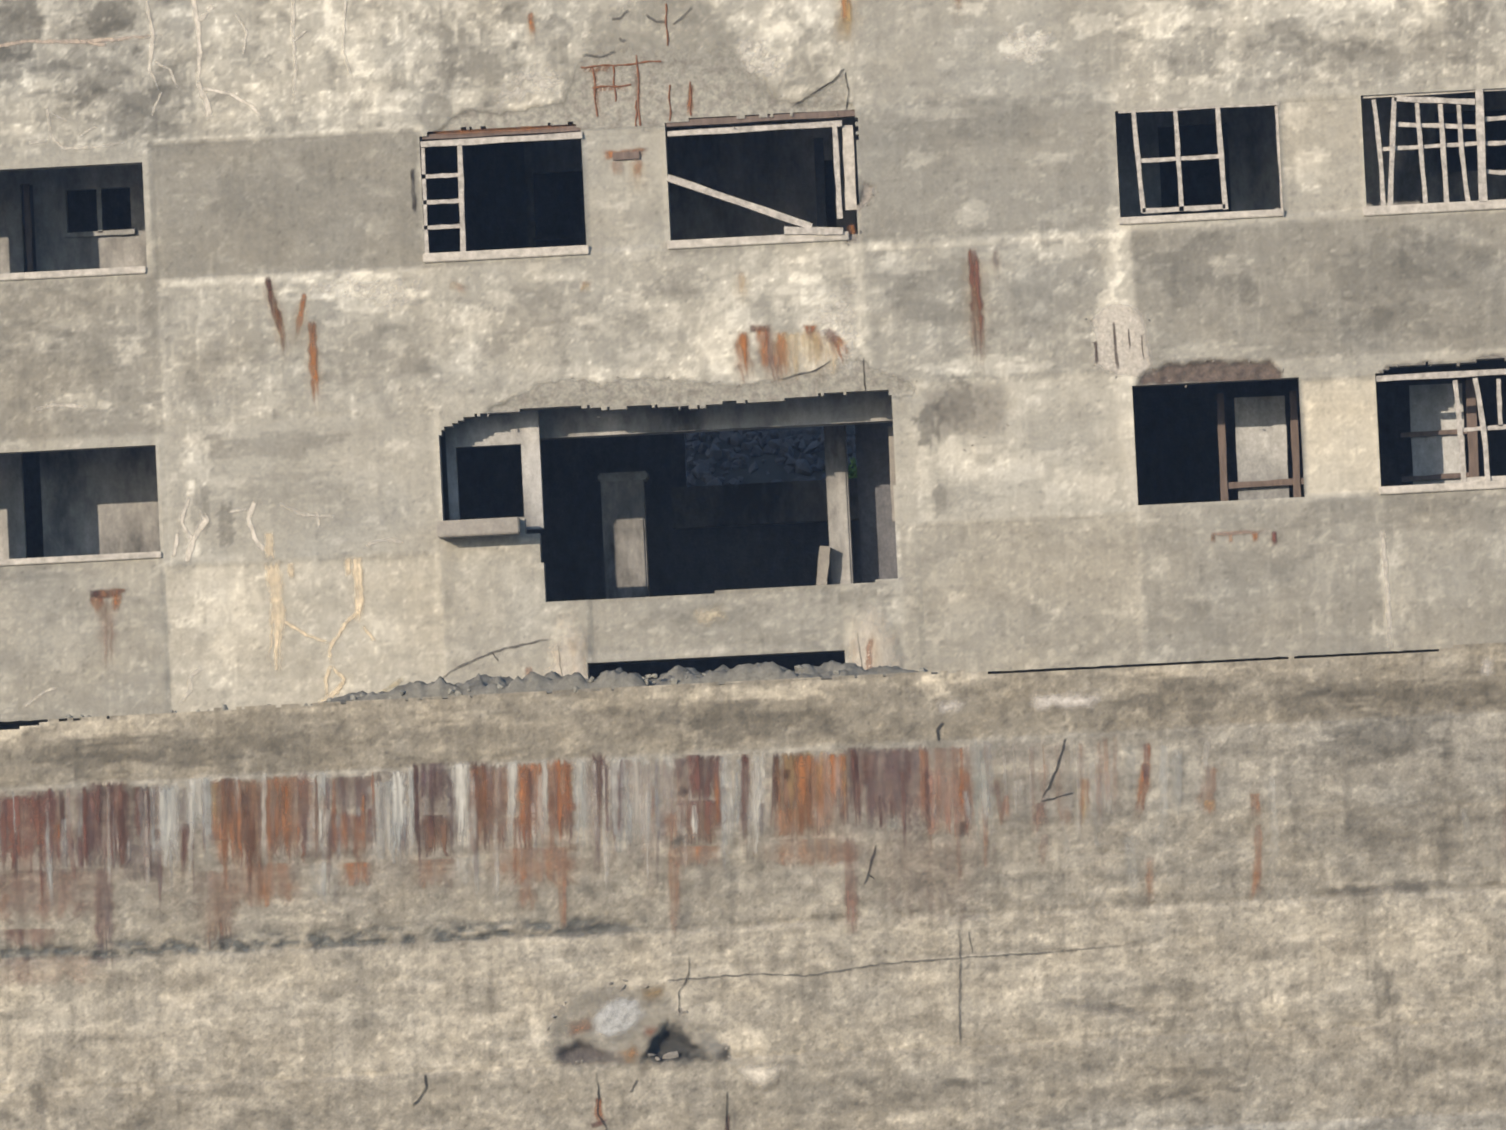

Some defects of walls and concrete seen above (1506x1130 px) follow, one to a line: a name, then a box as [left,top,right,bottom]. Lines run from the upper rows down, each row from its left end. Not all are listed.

crack [0,0,260,117]
spalling [438,4,852,133]
corrosion [265,278,318,391]
spalling [487,356,918,418]
corrosion [736,326,842,370]
corrosion [968,249,983,339]
peeling [1085,304,1284,387]
corrosion [90,589,125,607]
corrosion [395,760,573,914]
corrosion [684,748,922,854]
spalling [560,979,731,1065]
peeling [745,1068,776,1082]